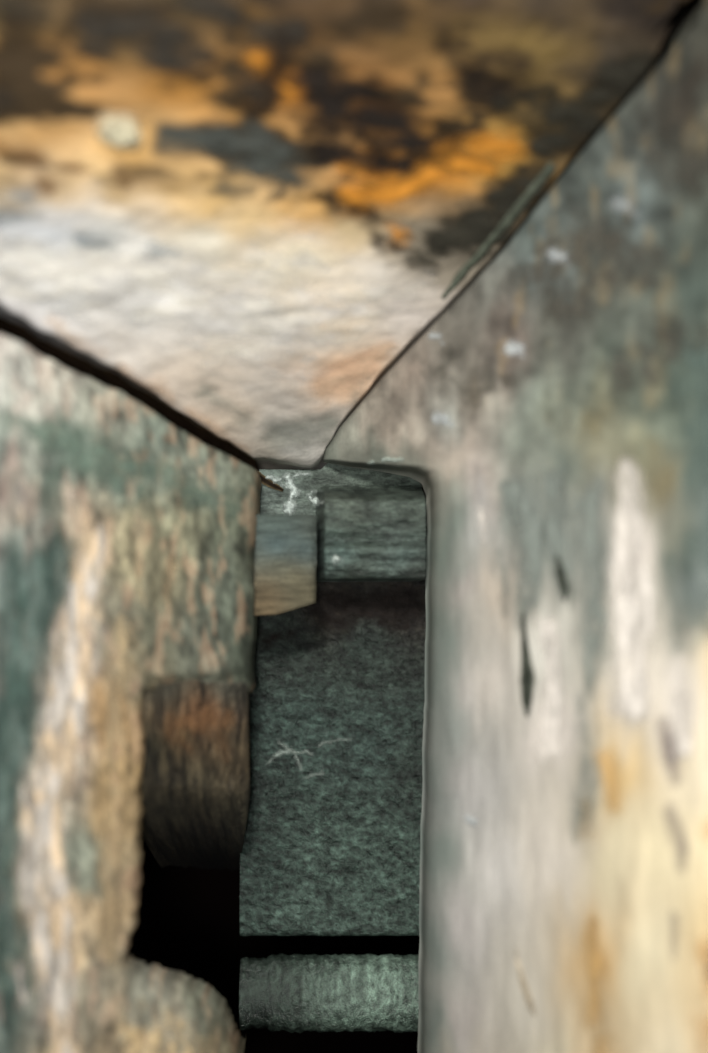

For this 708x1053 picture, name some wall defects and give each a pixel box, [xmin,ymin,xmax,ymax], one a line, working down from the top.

damp [74,9,217,83]
damp [155,0,456,196]
damp [315,190,382,221]
rust [338,134,520,203]
damp [374,53,652,273]